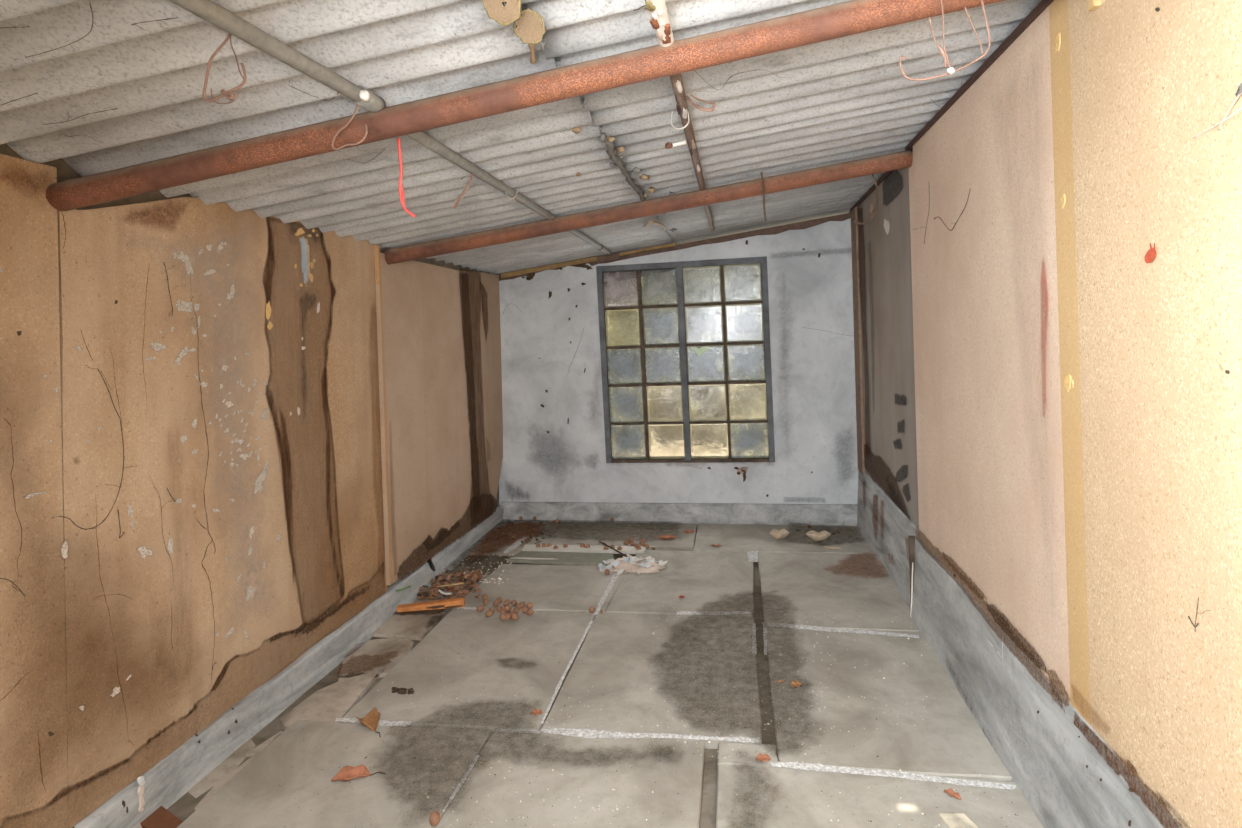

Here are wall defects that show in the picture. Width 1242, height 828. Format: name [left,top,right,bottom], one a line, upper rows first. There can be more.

crack [3,418,22,591]
crack [37,731,46,790]
damp [45,609,149,749]
damp [26,723,173,814]
crack [93,494,134,746]
crack [150,276,217,685]
damp [378,574,1016,812]
damp [857,208,1182,828]